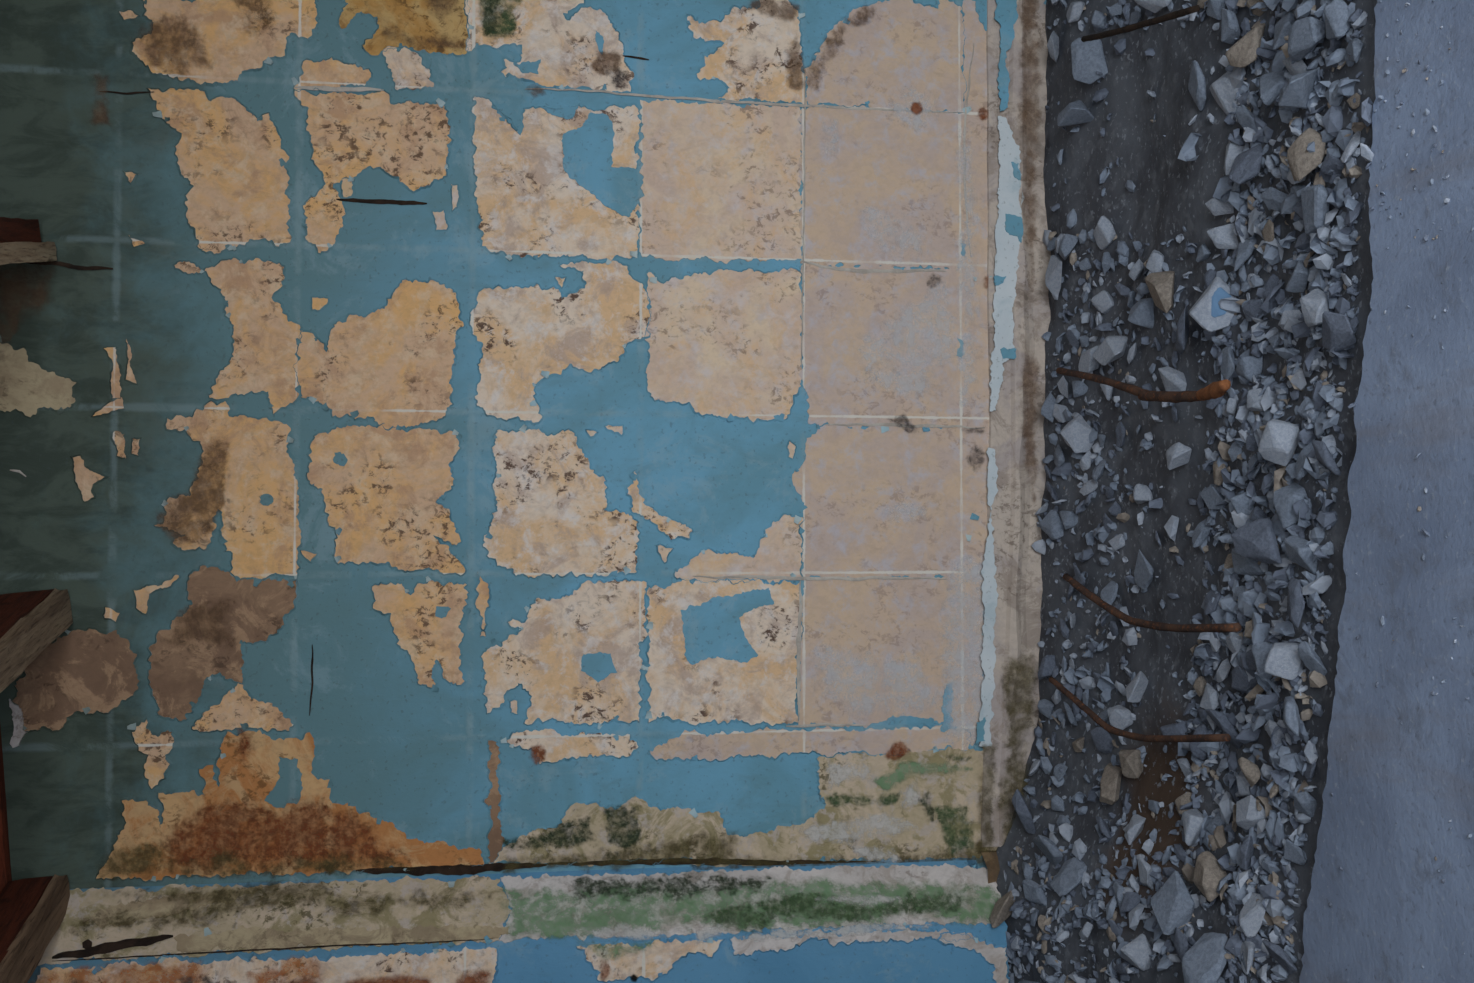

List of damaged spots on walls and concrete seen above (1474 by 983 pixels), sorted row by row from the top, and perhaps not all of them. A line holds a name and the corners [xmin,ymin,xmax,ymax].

water stain [480,0,520,37]
crack [336,197,427,205]
peeling [0,0,1010,983]
water stain [503,662,1036,957]
rust [165,802,401,870]
crack [52,935,495,961]
rust [255,959,318,983]
rust [457,972,489,983]